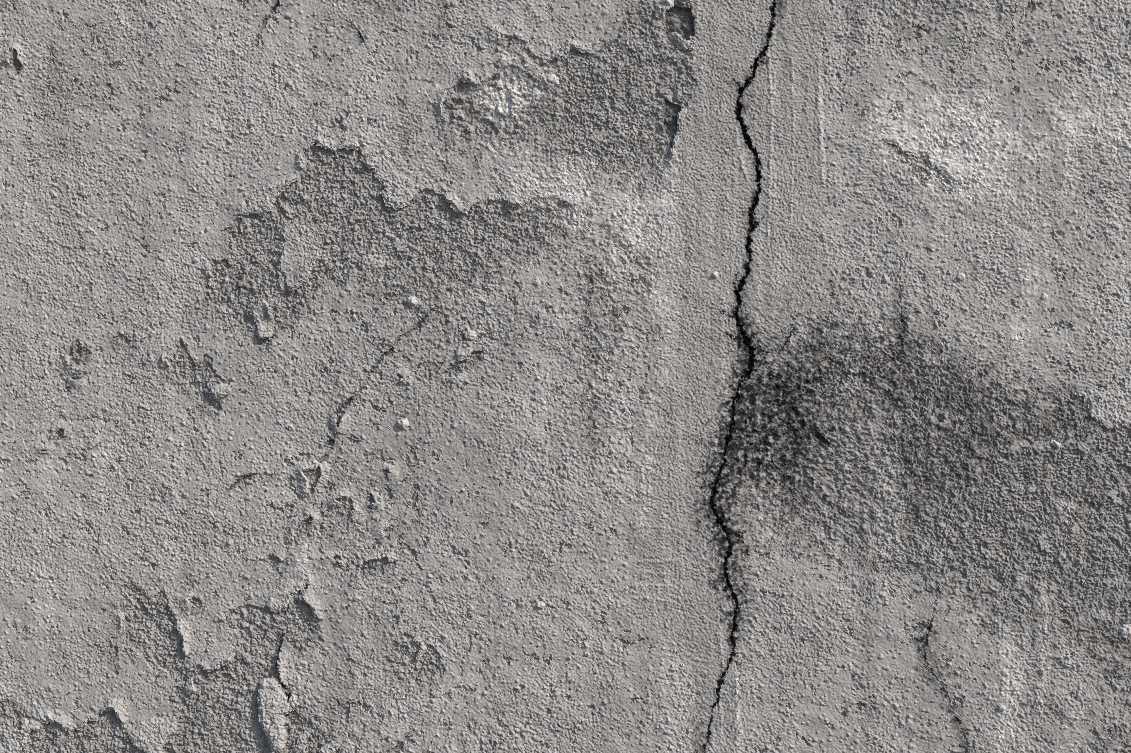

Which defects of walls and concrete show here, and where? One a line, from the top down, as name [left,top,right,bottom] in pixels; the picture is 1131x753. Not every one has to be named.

peeling [192,0,697,349]
peeling [0,460,400,753]
crack [703,0,776,749]
mould [694,306,813,648]